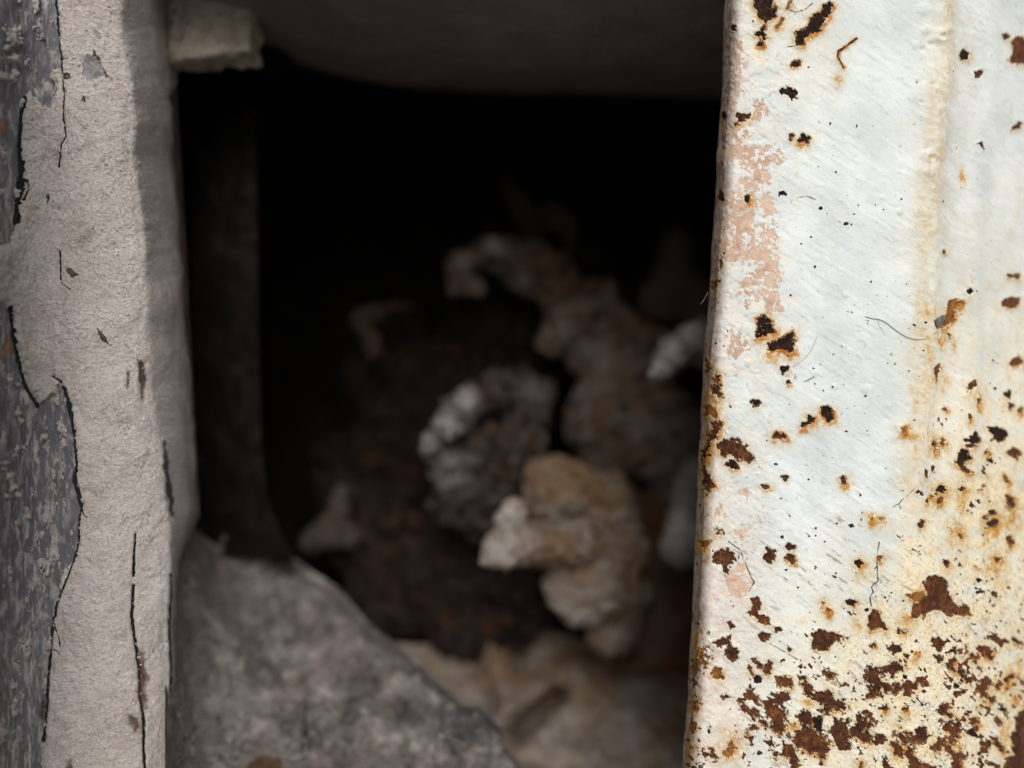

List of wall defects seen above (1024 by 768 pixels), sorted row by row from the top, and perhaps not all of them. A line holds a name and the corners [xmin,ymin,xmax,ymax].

crack [55,0,70,168]
peeling [715,37,792,316]
rust [752,0,836,69]
peeling [717,329,751,378]
rust [685,288,1024,768]
crack [130,533,146,768]